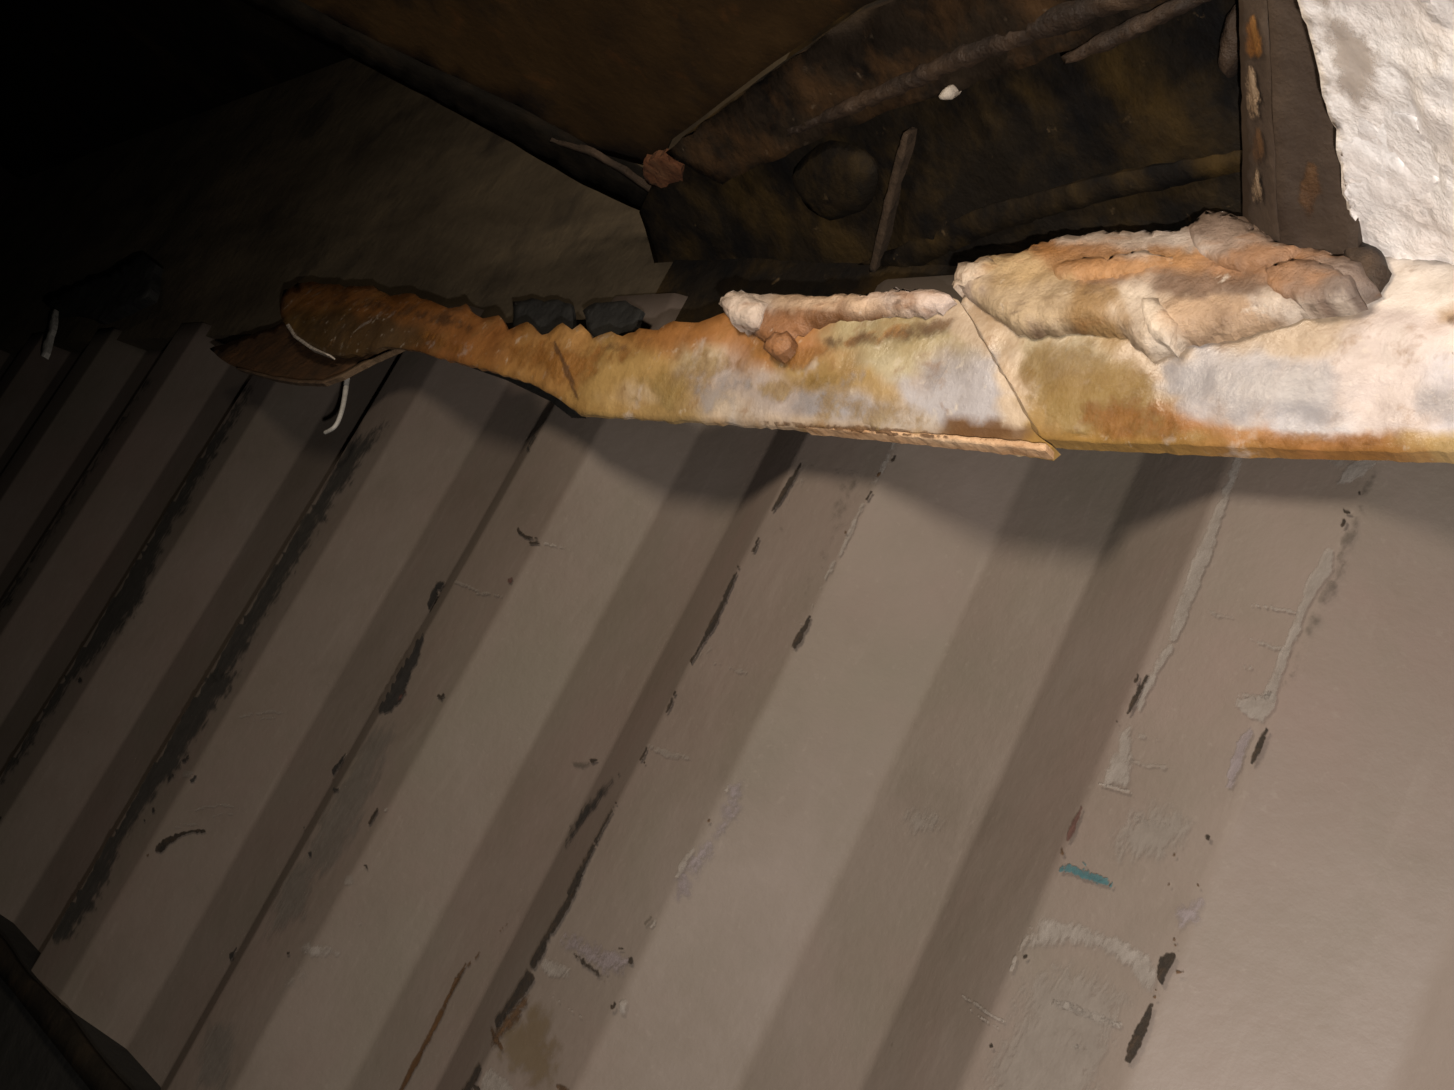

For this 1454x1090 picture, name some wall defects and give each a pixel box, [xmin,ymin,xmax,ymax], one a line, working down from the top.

peeling [939,85,961,101]
rust [1218,2,1263,200]
rust [719,211,1382,368]
rust [767,422,947,438]
spalling [1251,728,1268,764]